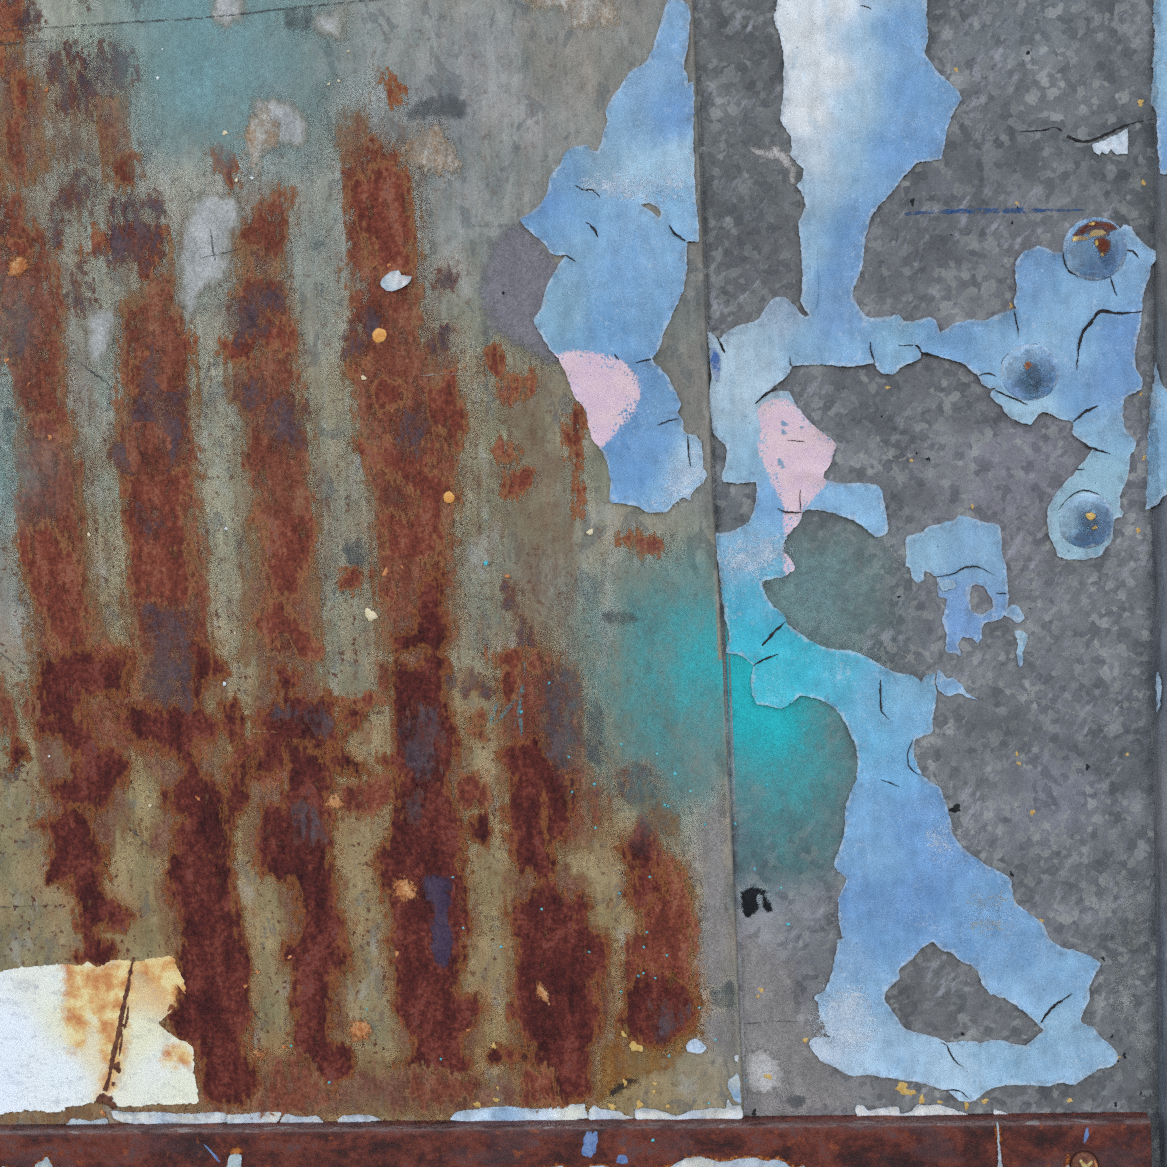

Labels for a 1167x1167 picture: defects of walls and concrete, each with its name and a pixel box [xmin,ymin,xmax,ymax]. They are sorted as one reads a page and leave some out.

peeling [520,0,707,513]
rust [0,0,704,1124]
peeling [707,0,1167,1116]
crack [96,957,135,1109]
peeling [686,1039,707,1053]
rust [653,1153,806,1167]